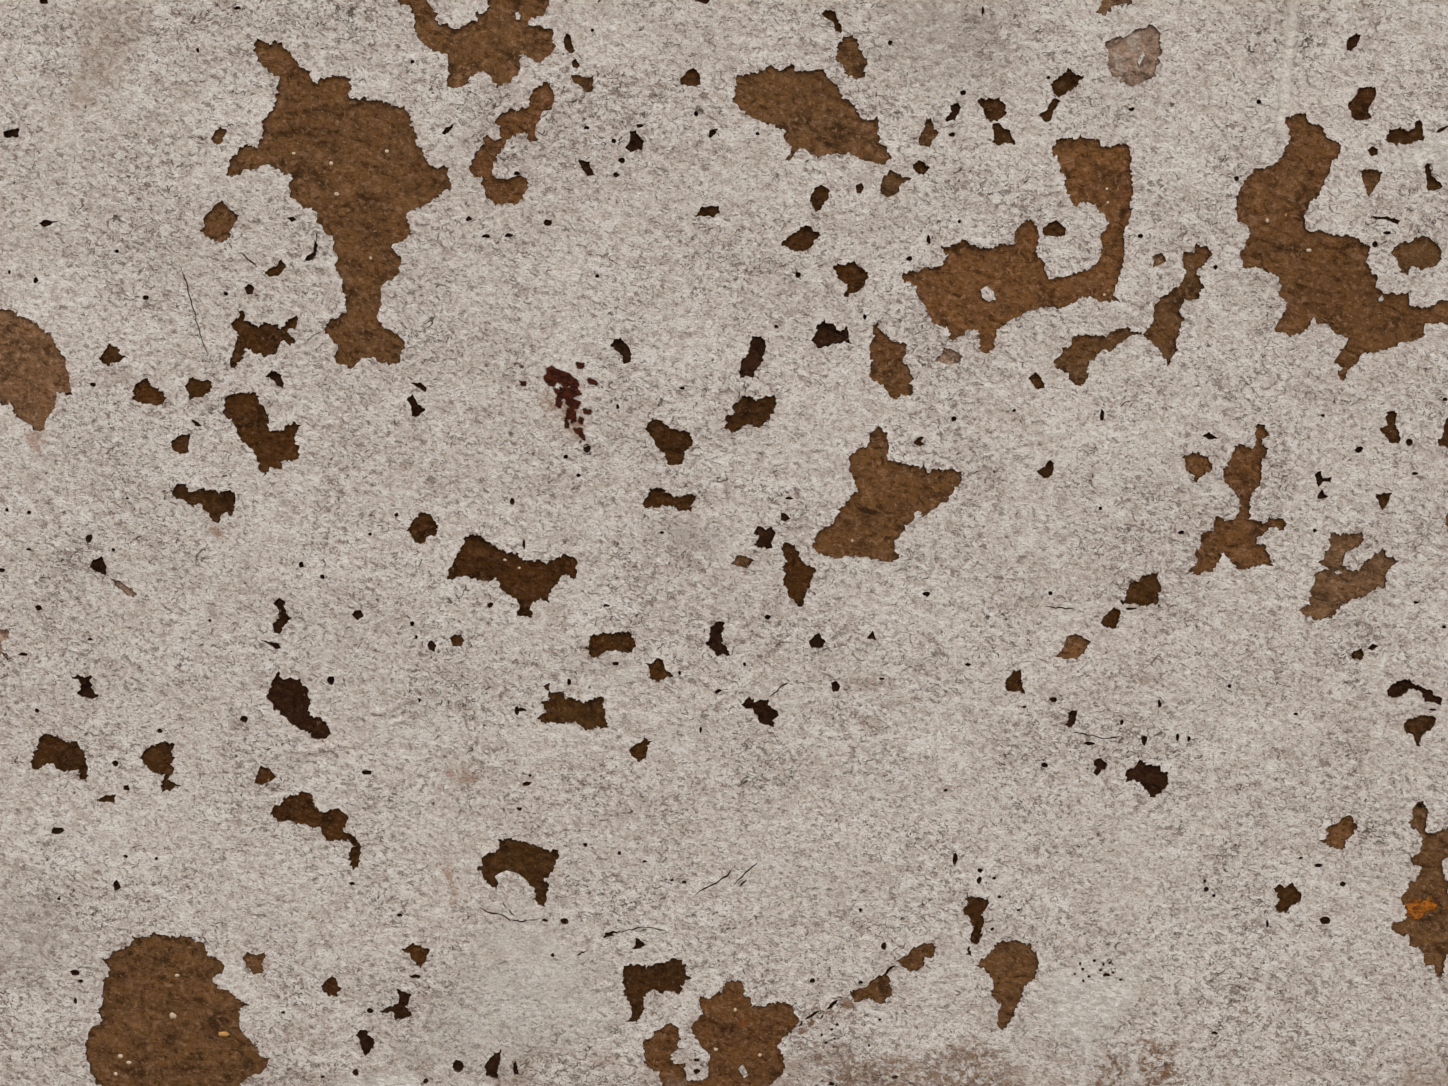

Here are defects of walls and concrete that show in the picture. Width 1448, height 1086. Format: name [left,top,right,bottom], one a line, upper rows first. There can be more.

peeling [397,0,594,93]
peeling [732,9,1015,197]
peeling [226,39,452,369]
peeling [902,134,1143,365]
peeling [1235,113,1448,381]
peeling [185,377,301,474]
peeling [447,534,578,618]
peeling [731,426,963,607]
peeling [1182,424,1287,575]
corrosion [1405,898,1448,919]
peeling [85,932,269,1086]
peeling [642,980,800,1086]